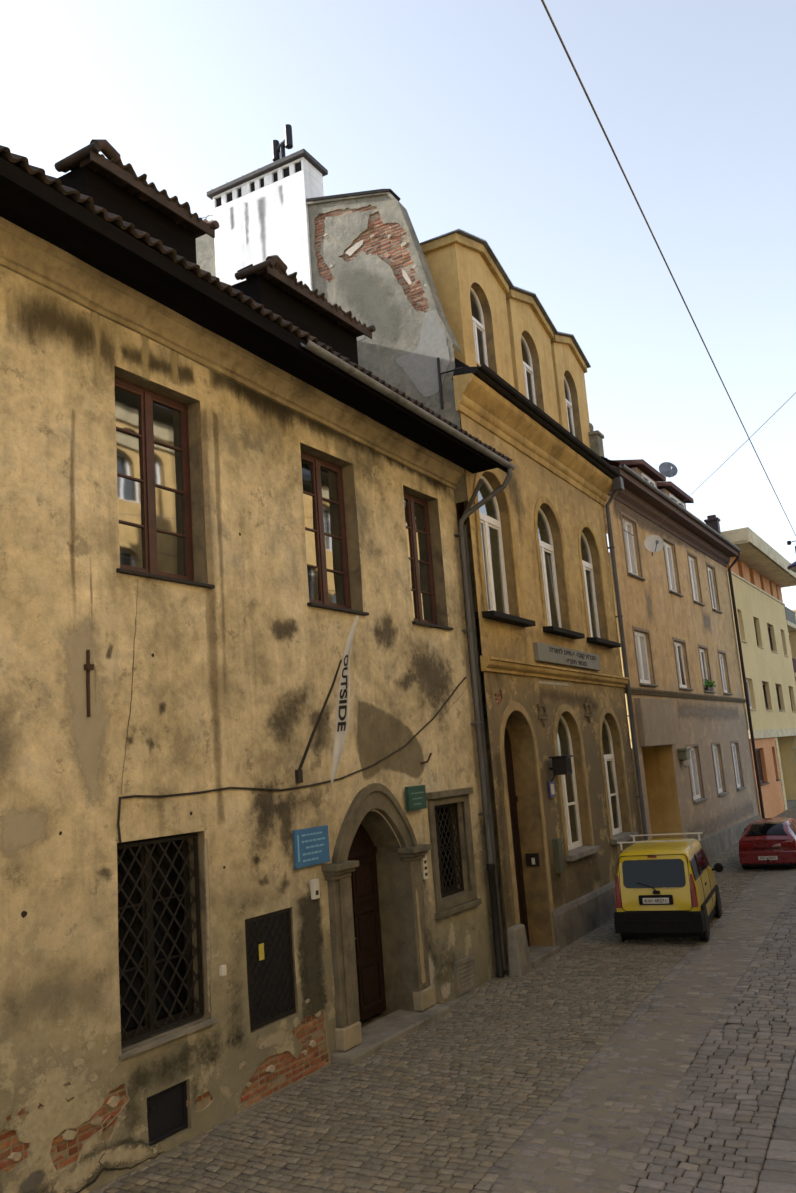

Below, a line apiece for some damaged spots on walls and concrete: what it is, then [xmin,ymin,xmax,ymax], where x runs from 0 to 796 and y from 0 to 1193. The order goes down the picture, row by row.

flaking render [314,205,429,312]
flaking render [0,1025,157,1193]
flaking render [186,999,329,1111]